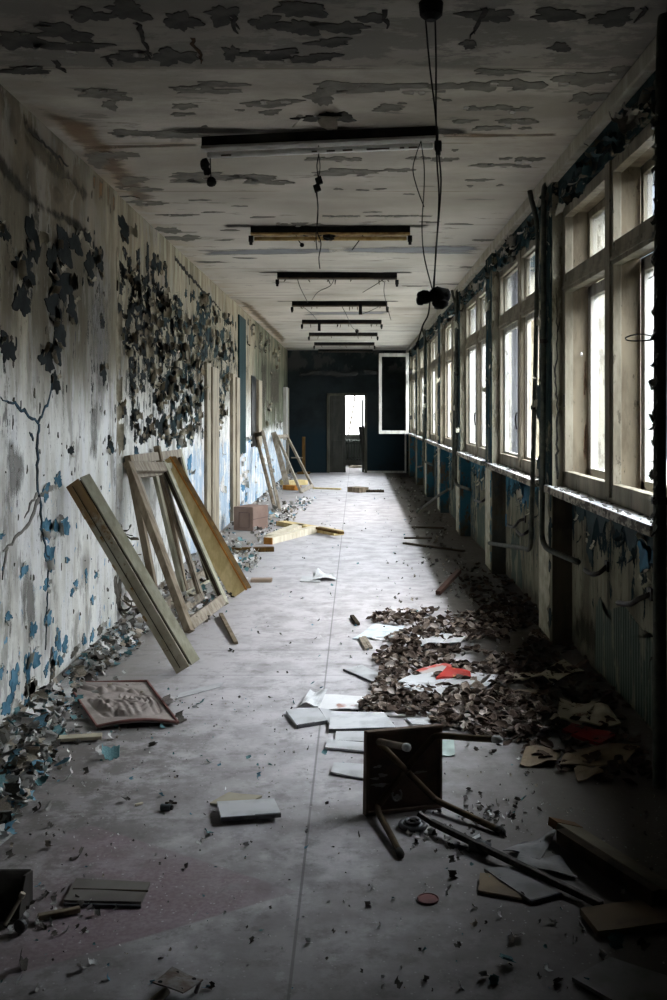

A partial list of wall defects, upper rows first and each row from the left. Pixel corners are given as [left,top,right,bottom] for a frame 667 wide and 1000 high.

peeling [0,0,387,67]
peeling [115,172,294,242]
peeling [304,149,459,176]
peeling [168,65,632,130]
peeling [0,330,17,368]
peeling [11,208,105,395]
peeling [91,208,283,555]
peeling [415,72,659,589]
crack [0,382,53,650]
peeling [2,513,87,594]
peeling [506,455,552,639]
peeling [0,558,147,716]